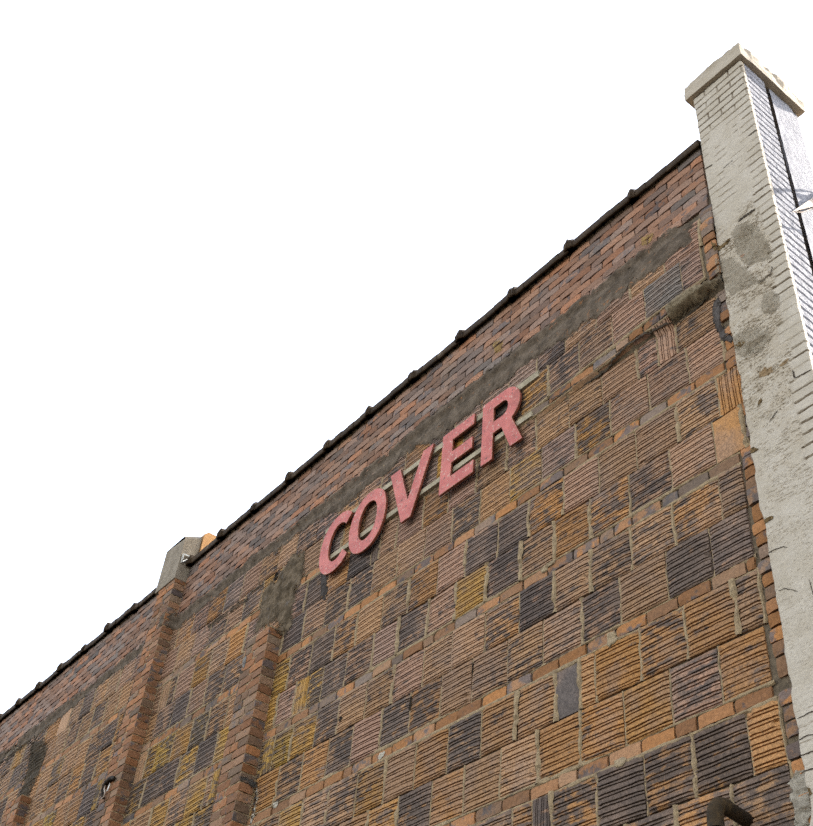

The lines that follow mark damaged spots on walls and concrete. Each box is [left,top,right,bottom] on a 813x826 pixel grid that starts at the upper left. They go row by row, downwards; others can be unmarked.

crack [797,711,813,773]